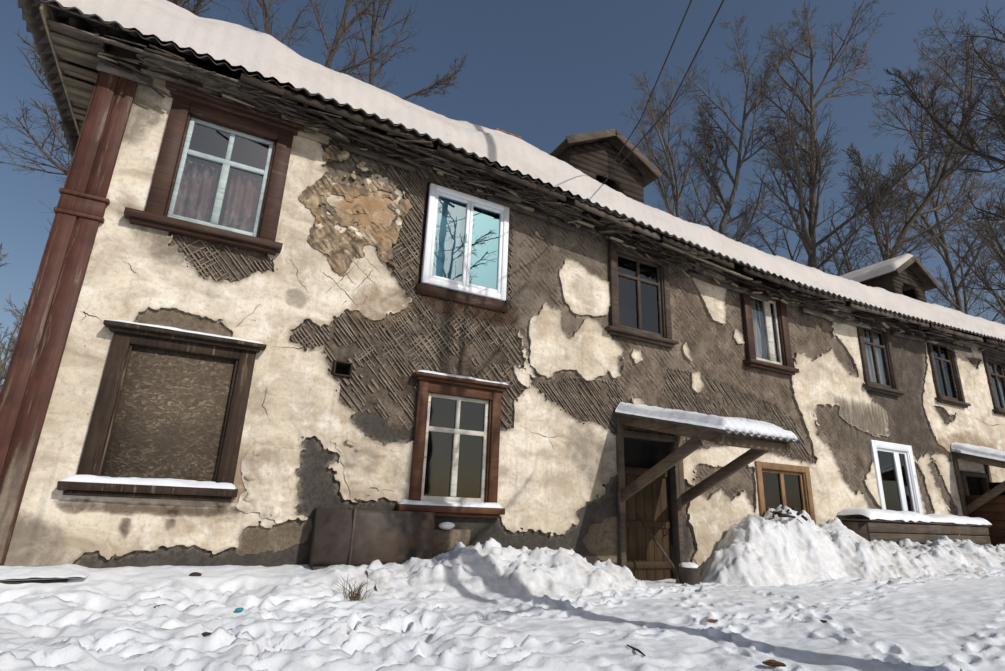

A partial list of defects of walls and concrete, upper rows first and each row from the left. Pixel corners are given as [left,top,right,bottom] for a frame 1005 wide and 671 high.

spalling [321,144,390,186]
spalling [135,308,233,337]
spalling [509,180,956,515]
spalling [351,411,414,446]
spalling [73,436,397,568]
spalling [434,475,618,565]
spalling [682,464,754,562]